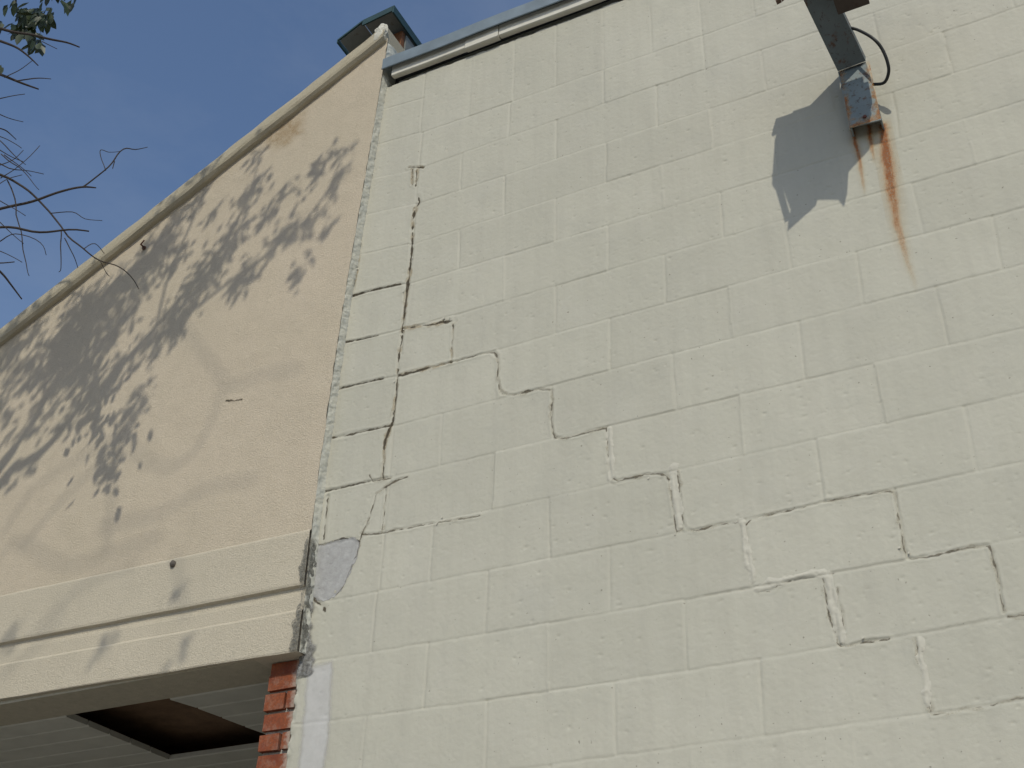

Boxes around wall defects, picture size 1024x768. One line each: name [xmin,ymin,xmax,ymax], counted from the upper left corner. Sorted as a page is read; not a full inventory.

corrosion [845,65,901,232]
crack [313,167,499,612]
crack [522,389,680,491]
crack [832,491,996,568]
peeling [289,537,360,678]
crack [825,593,889,647]